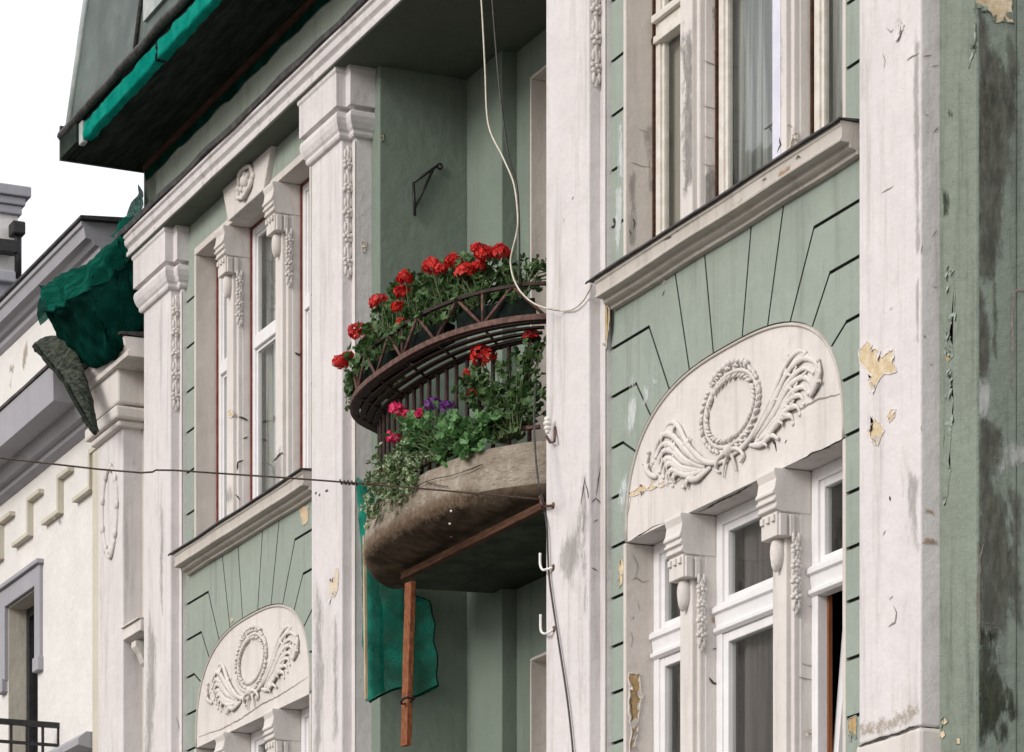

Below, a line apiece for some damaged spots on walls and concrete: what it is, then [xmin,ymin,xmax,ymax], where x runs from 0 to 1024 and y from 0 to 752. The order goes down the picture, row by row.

flaking render [969,0,1015,68]
leakage [979,10,1024,640]
flaking render [858,341,897,393]
peeling [942,265,956,505]
flaking render [867,408,896,446]
flaking render [628,480,669,497]
flaking render [627,672,644,752]
leakage [996,689,1018,741]